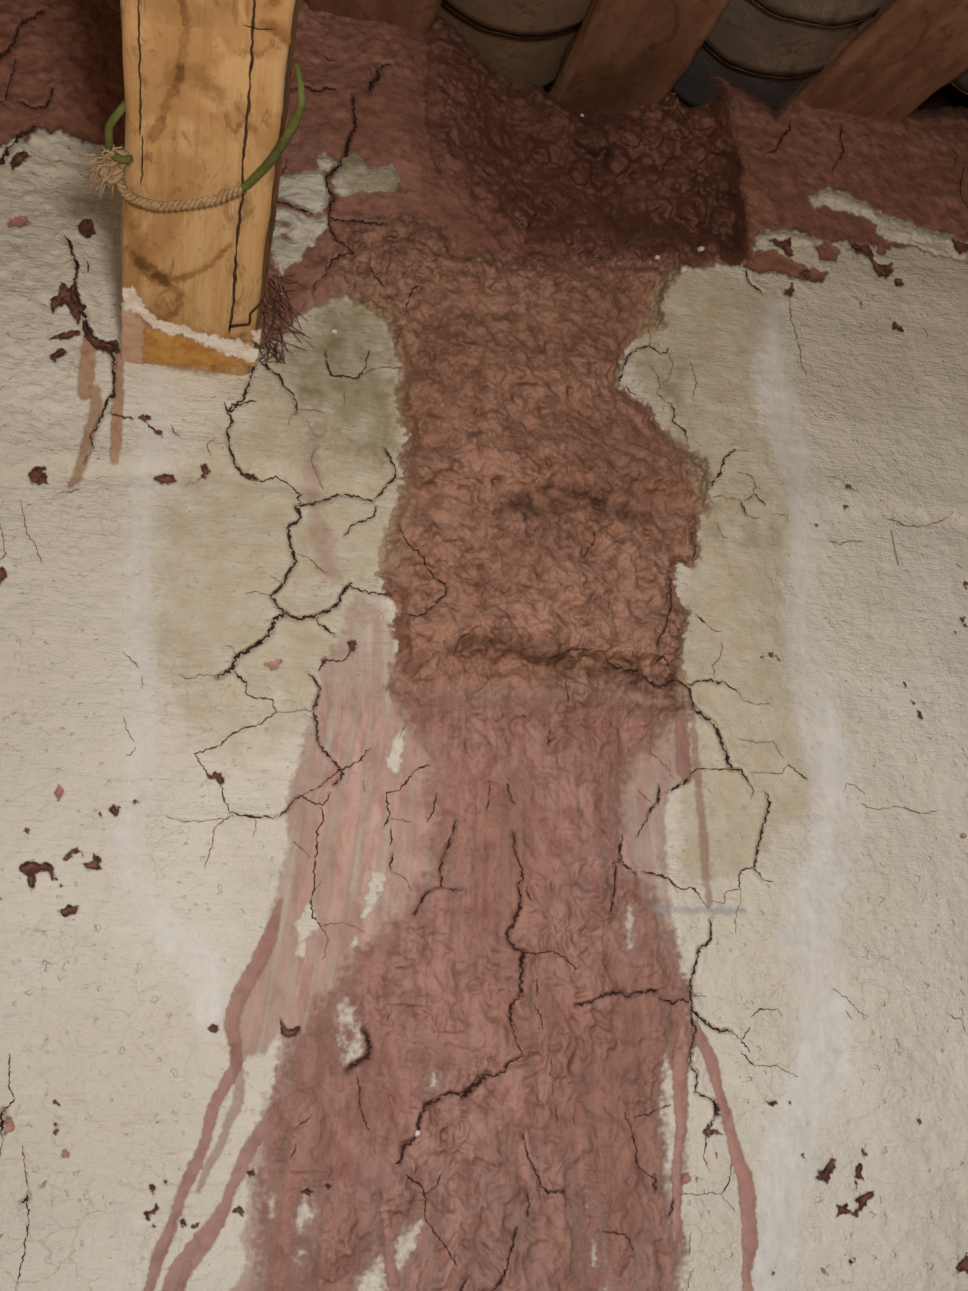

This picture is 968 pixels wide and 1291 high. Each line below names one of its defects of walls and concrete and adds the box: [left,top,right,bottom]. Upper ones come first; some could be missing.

crack [229,0,424,334]
spalling [50,281,121,362]
damp [69,335,124,486]
spalling [29,466,48,485]
crack [49,235,504,960]
spalling [19,848,102,891]
spalling [61,904,79,917]
crack [553,578,807,1290]
crack [346,1029,373,1131]
crack [396,780,577,1291]
spalling [817,1158,836,1184]
spalling [836,1148,874,1217]